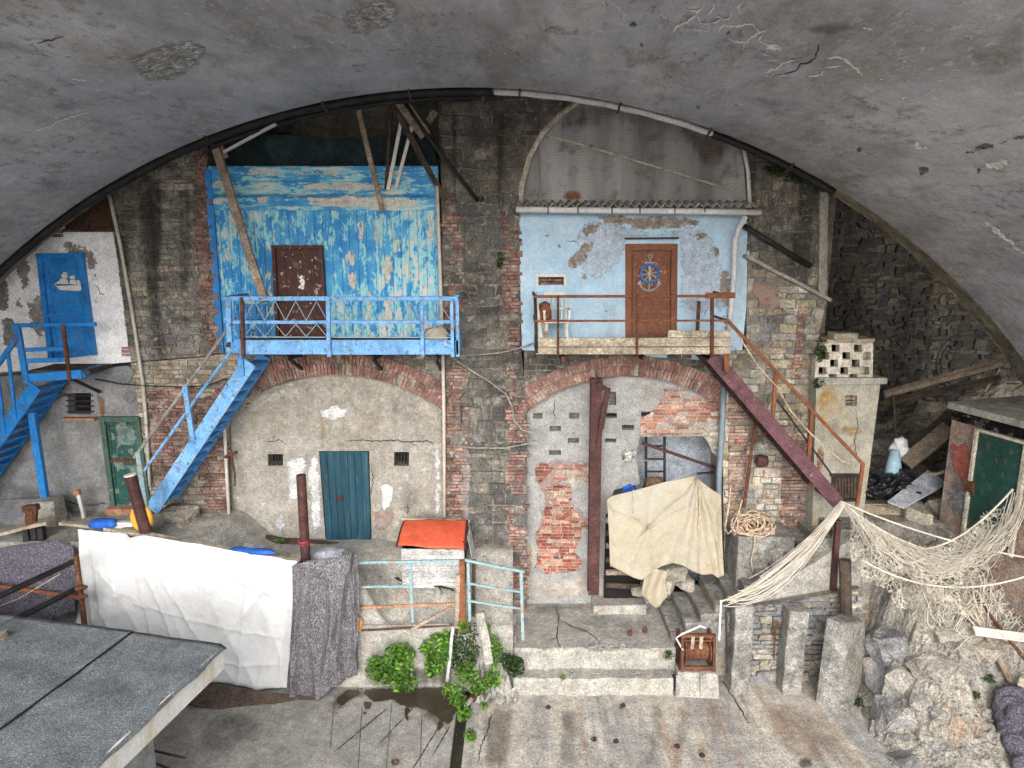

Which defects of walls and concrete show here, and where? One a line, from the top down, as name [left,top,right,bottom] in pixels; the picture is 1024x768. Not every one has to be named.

crack [661,2,862,77]
peeling [241,169,417,209]
flaking render [0,260,44,347]
flaking render [52,230,97,280]
peeling [345,250,393,329]
peeling [382,237,401,284]
peeling [568,215,730,329]
crack [350,439,433,450]
flaking render [640,387,720,455]
peeling [946,443,971,518]
flaking render [528,460,589,599]
crack [550,608,599,648]